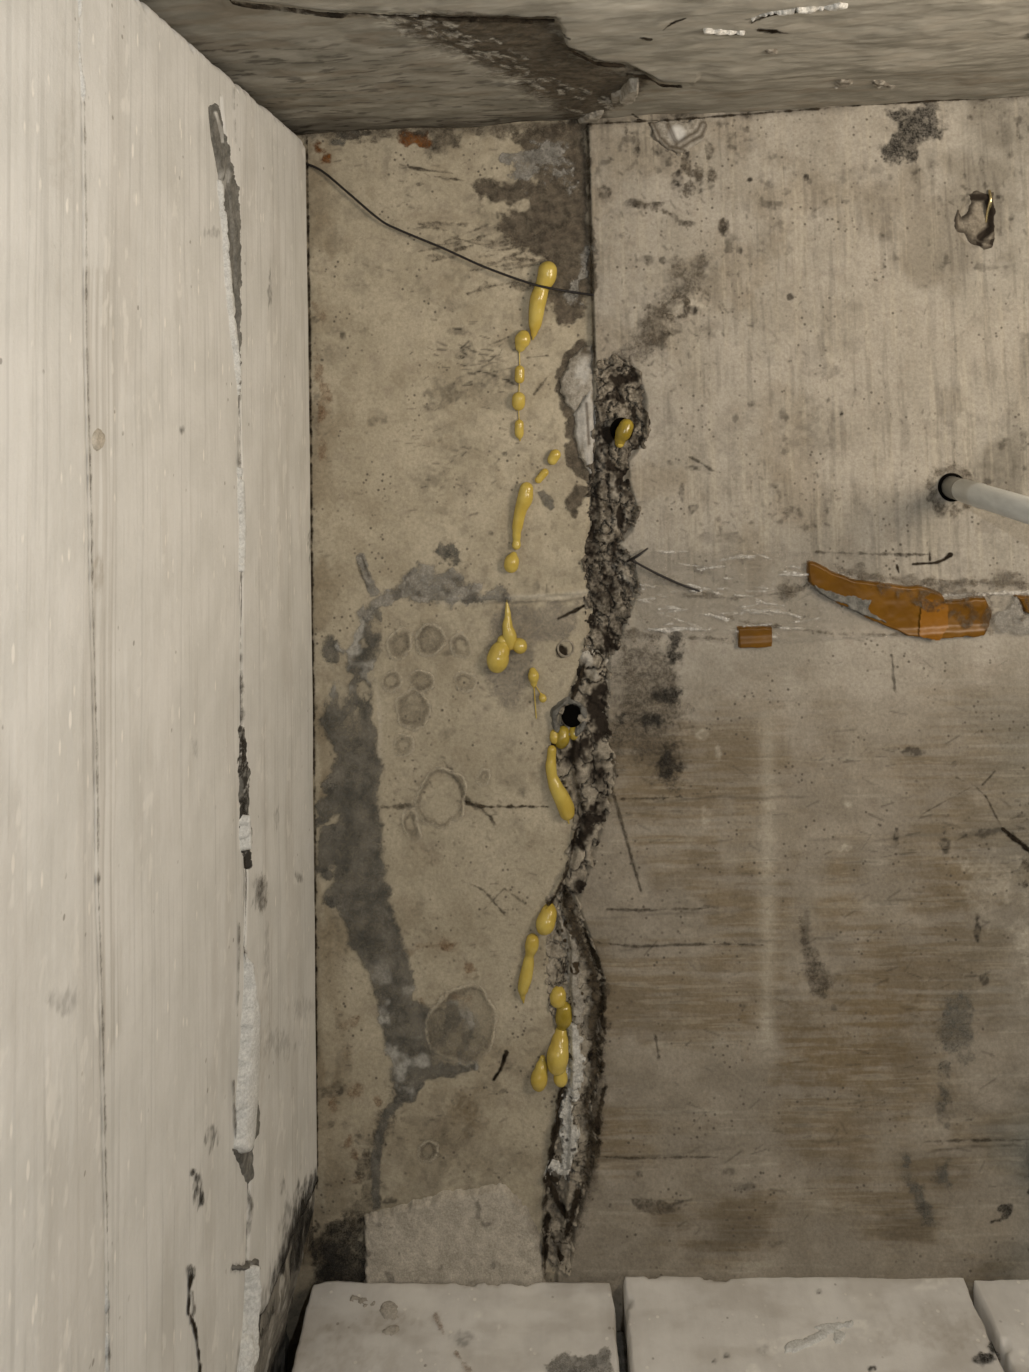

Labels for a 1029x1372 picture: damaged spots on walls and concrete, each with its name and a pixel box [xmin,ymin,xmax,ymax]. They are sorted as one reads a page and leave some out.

water stain [384,11,645,325]
flaking render [578,77,639,124]
crack [237,395,253,964]
crack [450,341,745,1276]
crack [187,1266,202,1372]